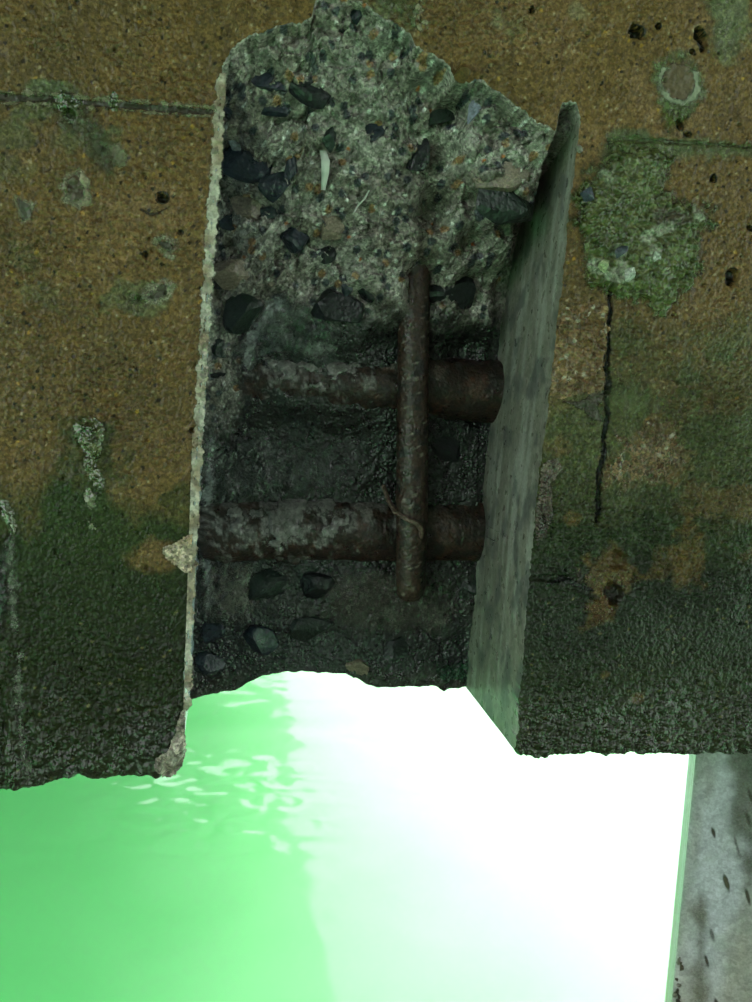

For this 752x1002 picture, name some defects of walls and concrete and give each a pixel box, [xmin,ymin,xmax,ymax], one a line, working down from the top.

spalling [153,0,581,778]
crack [595,292,613,523]
damp [0,499,20,631]
damp [13,652,24,707]